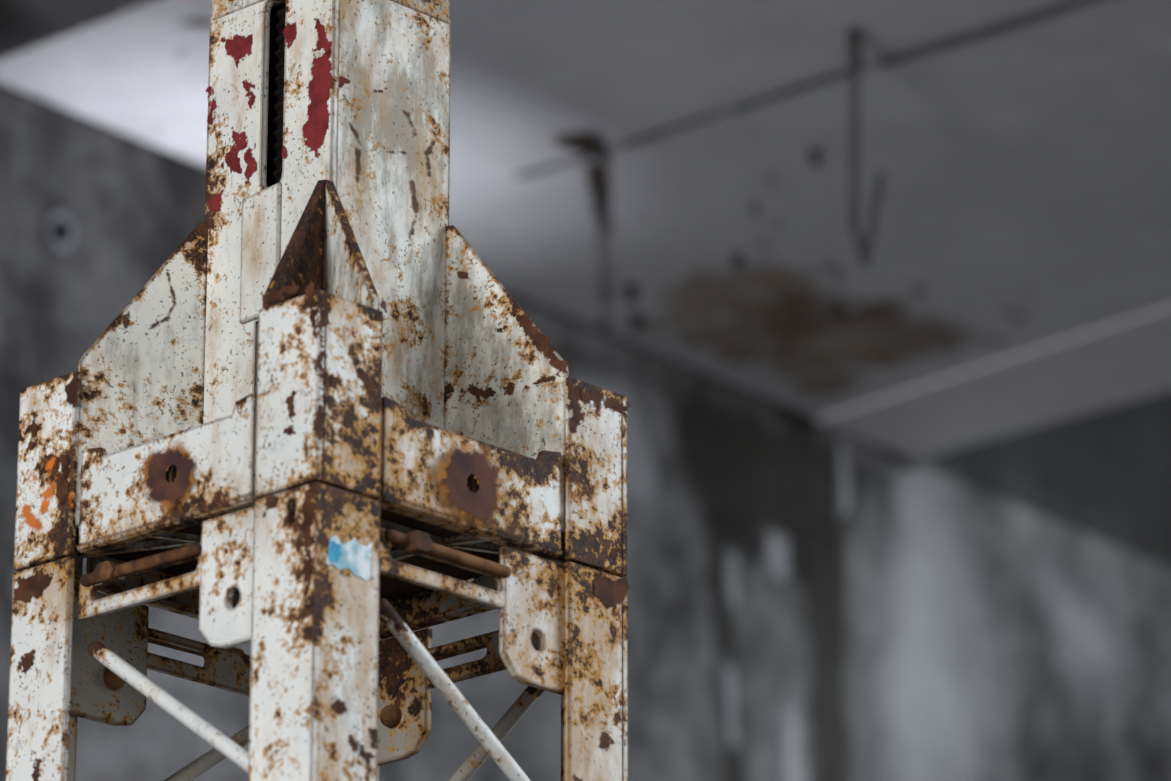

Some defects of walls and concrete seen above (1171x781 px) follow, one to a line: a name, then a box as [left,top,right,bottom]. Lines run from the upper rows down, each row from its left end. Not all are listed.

peeling [221,34,252,66]
peeling [283,22,296,48]
peeling [206,86,216,127]
peeling [242,79,256,109]
peeling [302,18,351,158]
peeling [220,130,257,184]
corrosion [461,311,631,434]
corrosion [283,391,296,435]
corrosion [142,441,195,513]
corrosion [436,445,504,527]
corrosion [13,571,59,603]
corrosion [17,648,37,678]